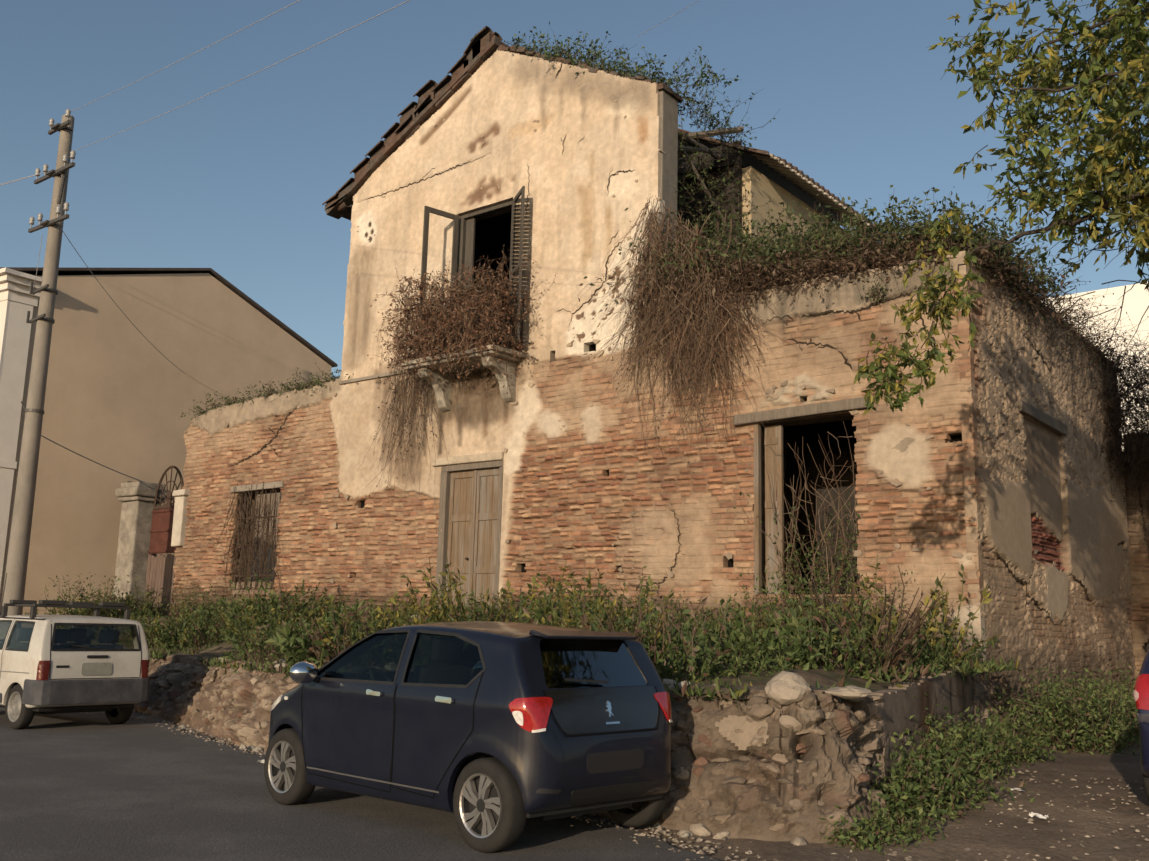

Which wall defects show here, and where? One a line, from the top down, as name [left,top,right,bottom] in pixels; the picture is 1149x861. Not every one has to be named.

crack [361,153,491,201]
flaking render [607,169,638,200]
crack [766,287,935,371]
spalling [169,372,442,620]
spalling [503,198,1137,740]
crack [629,508,686,588]
crack [990,550,1050,618]
crack [1070,574,1093,604]